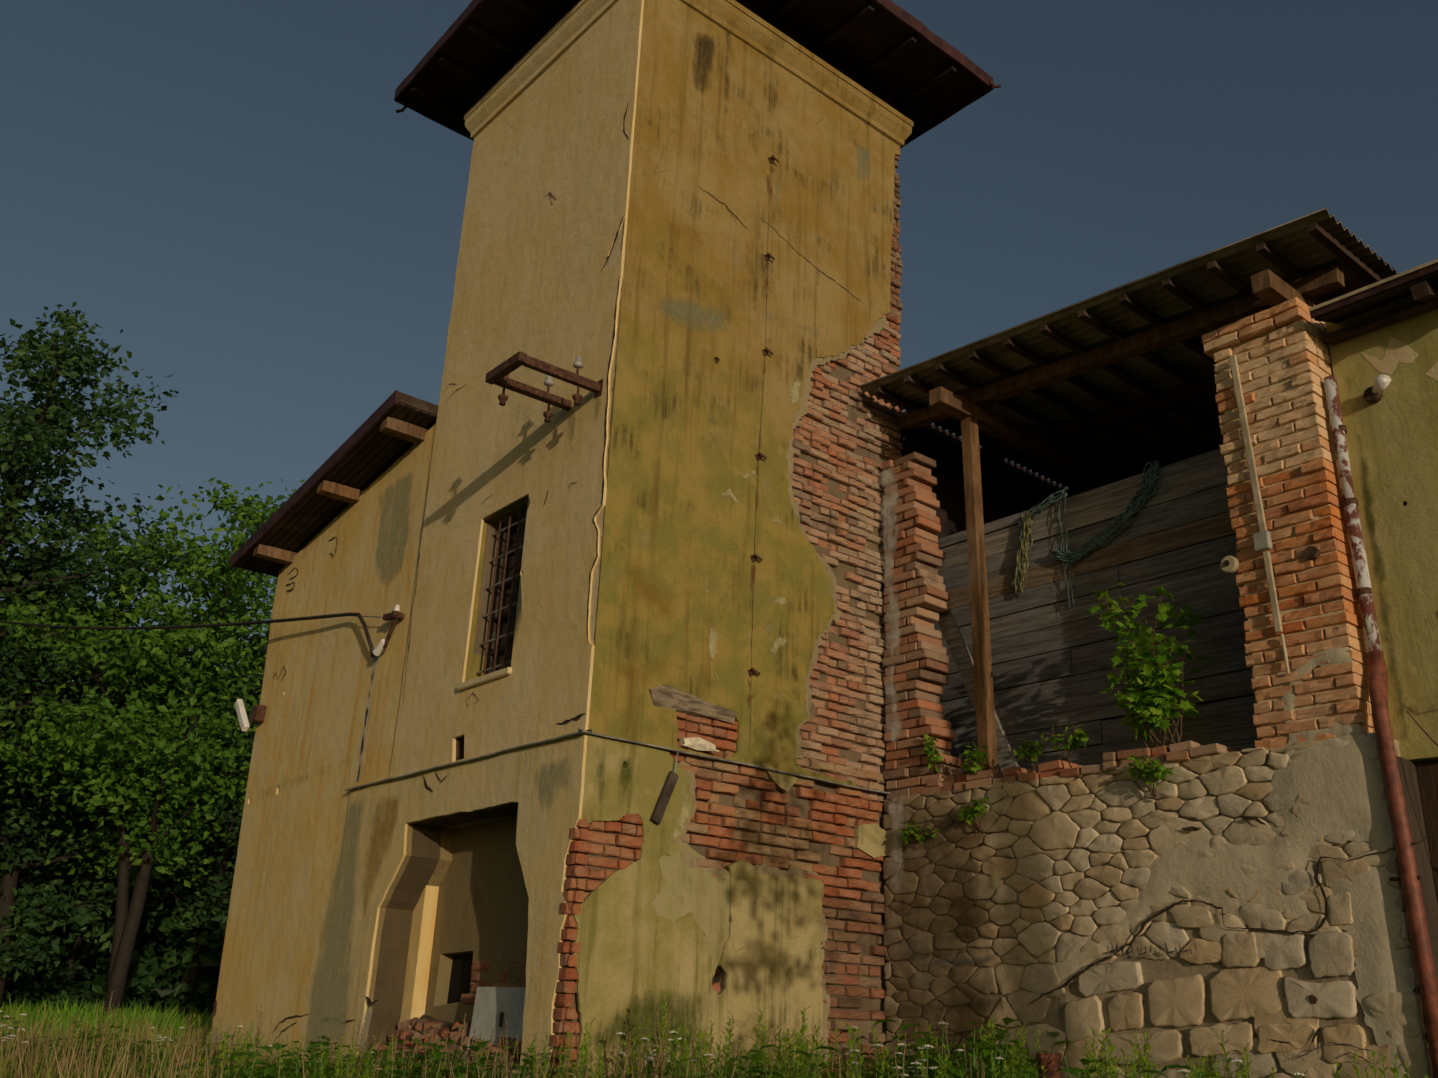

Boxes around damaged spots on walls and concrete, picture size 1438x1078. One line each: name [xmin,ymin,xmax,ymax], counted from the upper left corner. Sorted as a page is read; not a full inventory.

water stain [377,474,411,582]
peeling [587,220,625,645]
flaking render [649,155,903,1077]
crack [699,169,864,746]
peeling [1361,337,1419,374]
water stain [308,806,361,1046]
flaking render [550,813,643,1074]
crack [1028,831,1438,1005]